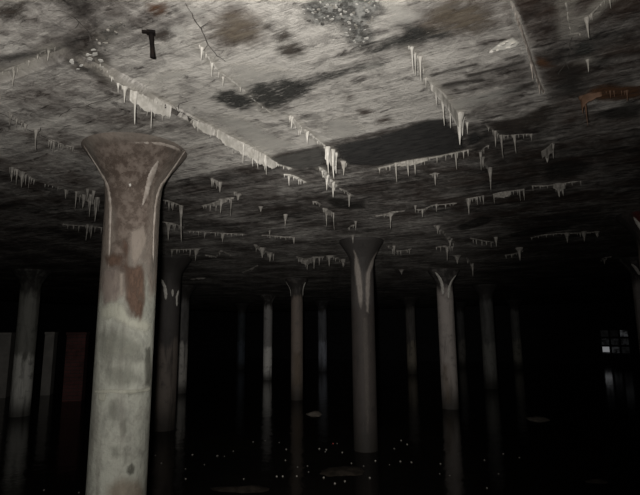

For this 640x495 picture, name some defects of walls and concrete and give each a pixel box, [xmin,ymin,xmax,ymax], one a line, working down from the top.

crack [185,3,226,62]
water stain [107,71,171,124]
water stain [192,1,545,226]
rust [590,85,640,100]
water stain [9,167,37,188]
water stain [44,184,100,218]
water stain [62,146,112,269]
rust [94,141,179,317]
water stain [433,225,475,274]
water stain [479,105,585,204]